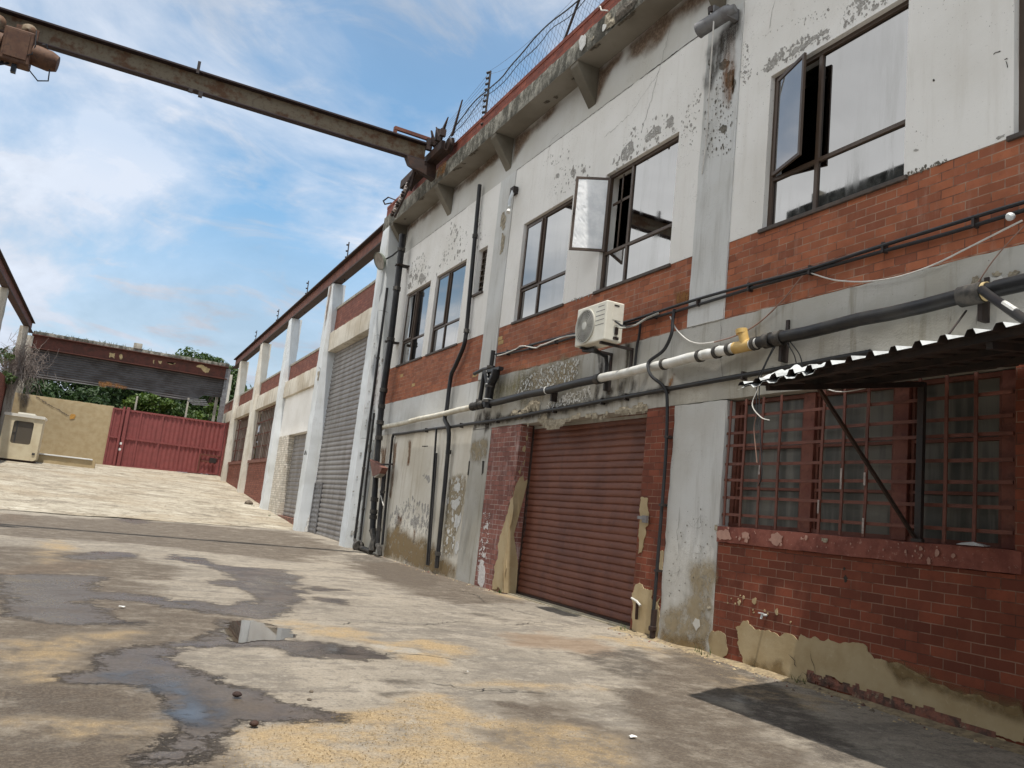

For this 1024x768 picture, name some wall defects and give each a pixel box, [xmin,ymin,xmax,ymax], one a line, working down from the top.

peeling [612,8,830,171]
peeling [407,212,482,289]
water stain [383,525,455,577]
flaking render [443,461,484,555]
peeling [492,358,649,593]
peeling [632,550,694,637]
water stain [662,563,715,651]
peeling [680,508,756,580]
peeling [769,532,783,546]
peeling [692,595,1024,743]